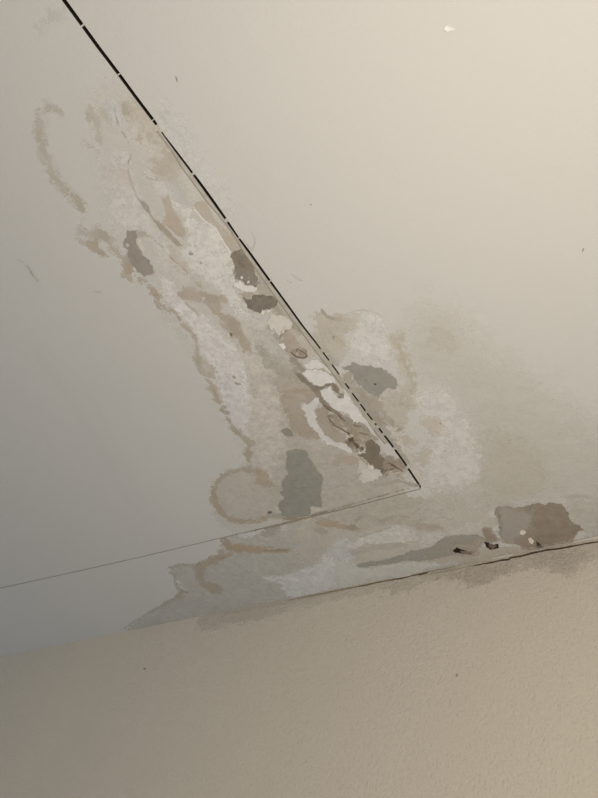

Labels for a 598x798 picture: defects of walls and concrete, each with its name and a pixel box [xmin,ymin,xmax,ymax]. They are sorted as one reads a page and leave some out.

spalling [123,230,155,277]
spalling [139,195,194,273]
leakage [76,84,499,631]
spalling [194,200,406,483]
spalling [268,448,323,521]
spalling [262,501,586,598]